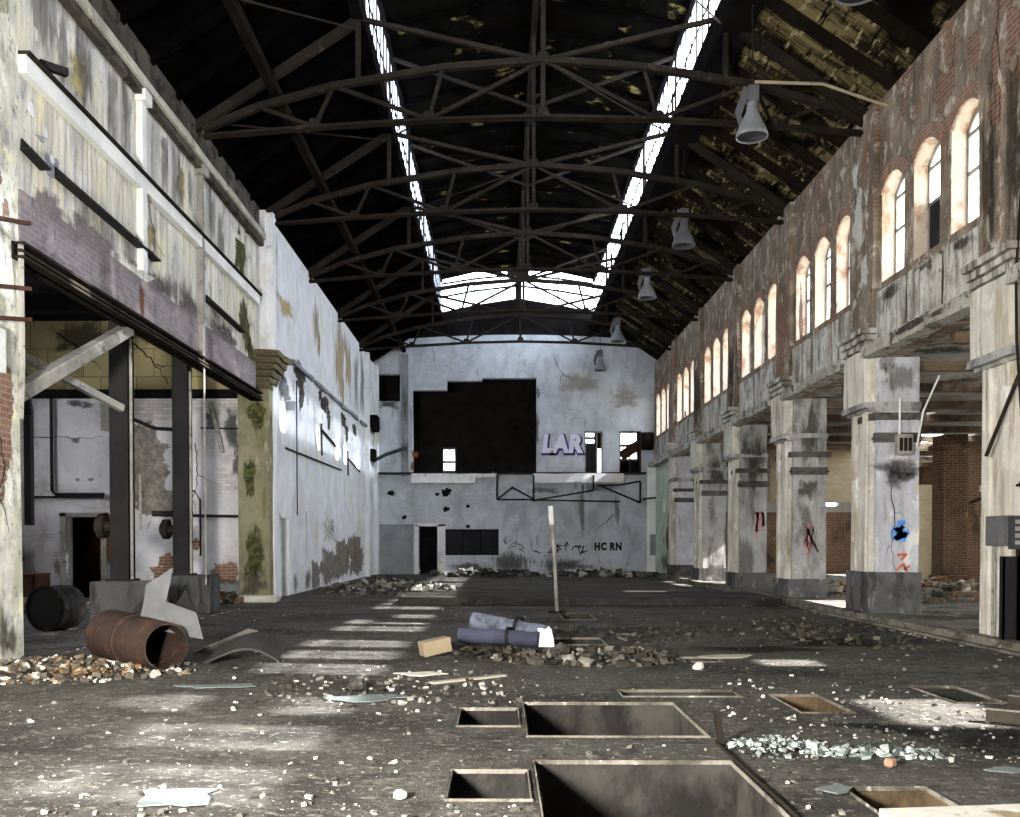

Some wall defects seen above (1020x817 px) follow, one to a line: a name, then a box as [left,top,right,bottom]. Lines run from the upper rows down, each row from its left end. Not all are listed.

flaking render [2,199,11,236]
flaking render [0,366,15,506]
flaking render [134,414,173,524]
water stain [888,471,913,487]
flaking render [150,545,173,579]
flaking render [210,552,239,583]
water stain [243,571,267,595]
flaking render [312,524,364,589]